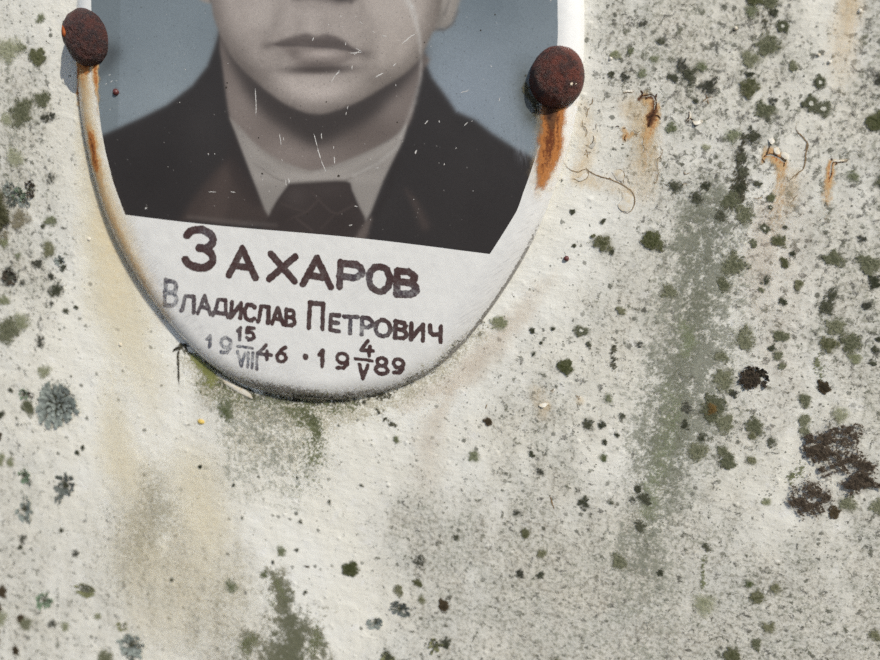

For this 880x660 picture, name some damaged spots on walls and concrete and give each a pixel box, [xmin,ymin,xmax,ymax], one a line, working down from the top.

corrosion [76,62,140,276]
corrosion [537,106,566,188]
corrosion [622,94,660,149]
corrosion [762,147,787,202]
water stain [238,631,258,660]
water stain [307,621,325,657]